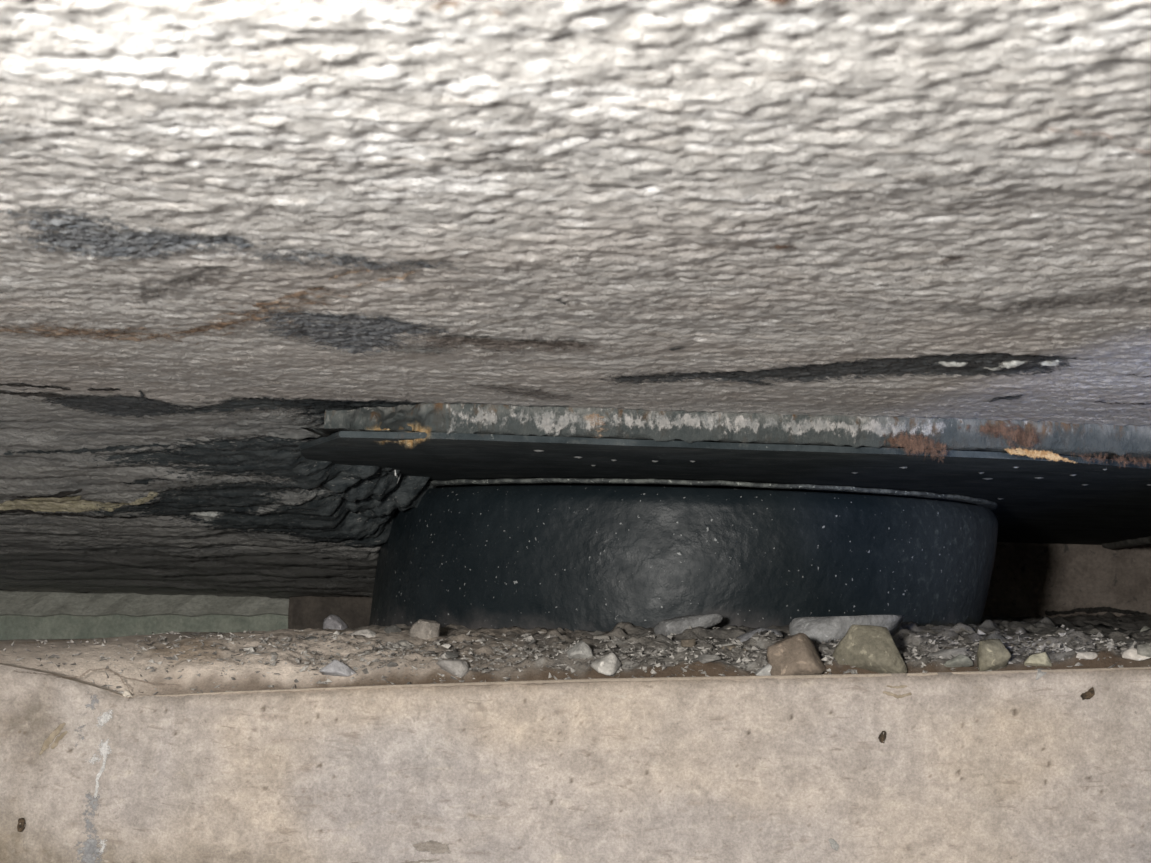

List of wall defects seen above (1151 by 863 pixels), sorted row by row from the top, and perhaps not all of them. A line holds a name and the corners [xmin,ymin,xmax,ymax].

rust [0,268,417,346]
peeling [0,390,470,553]
rust [883,431,947,462]
rust [958,420,1151,466]
damp [77,695,112,863]